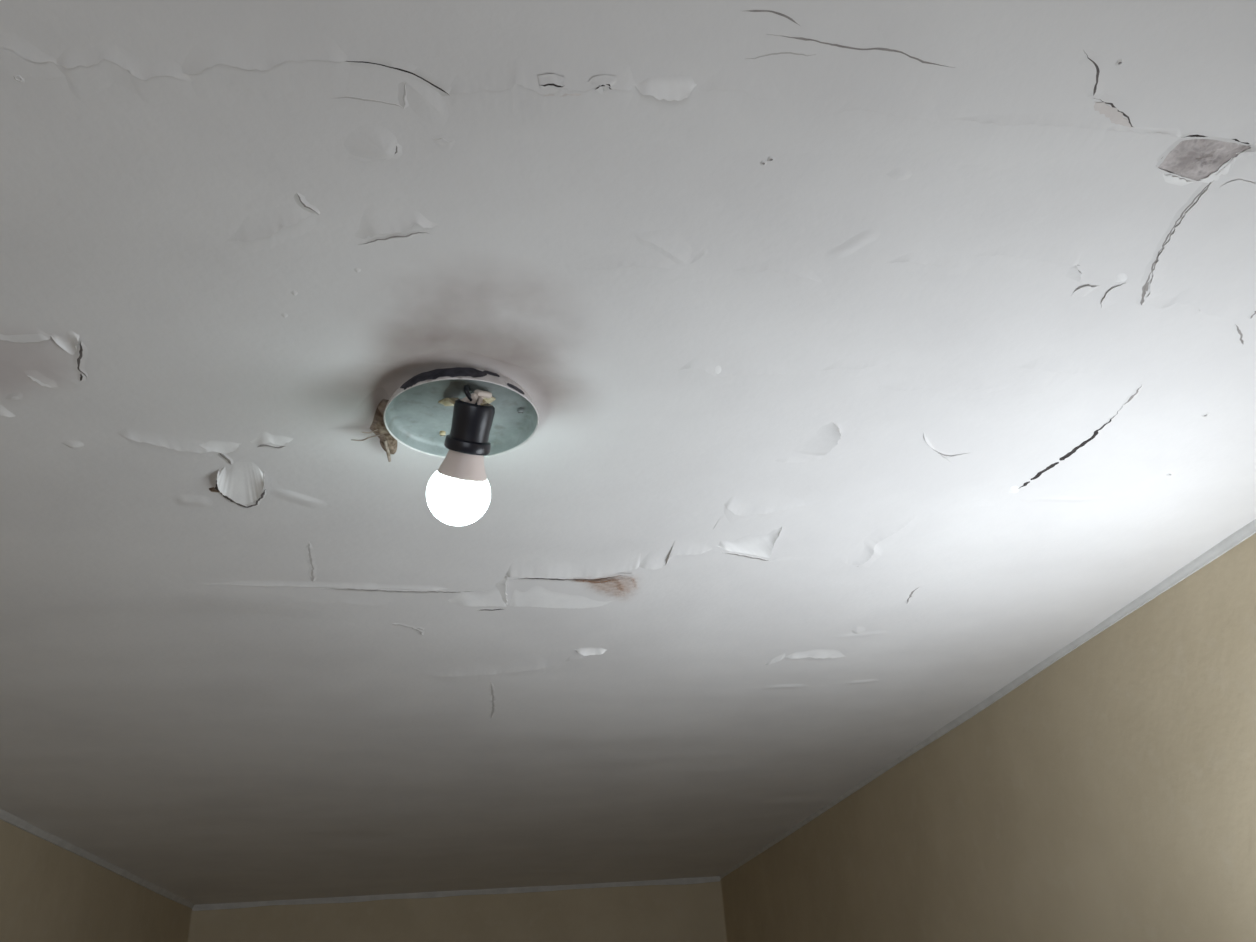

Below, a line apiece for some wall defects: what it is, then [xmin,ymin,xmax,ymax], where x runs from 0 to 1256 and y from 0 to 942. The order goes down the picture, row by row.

crack [1073,48,1144,128]
flaking render [1151,130,1256,204]
crack [1136,174,1232,305]
peeling [0,325,88,388]
peeling [117,428,327,509]
crack [1009,384,1143,493]
peeling [189,527,813,611]